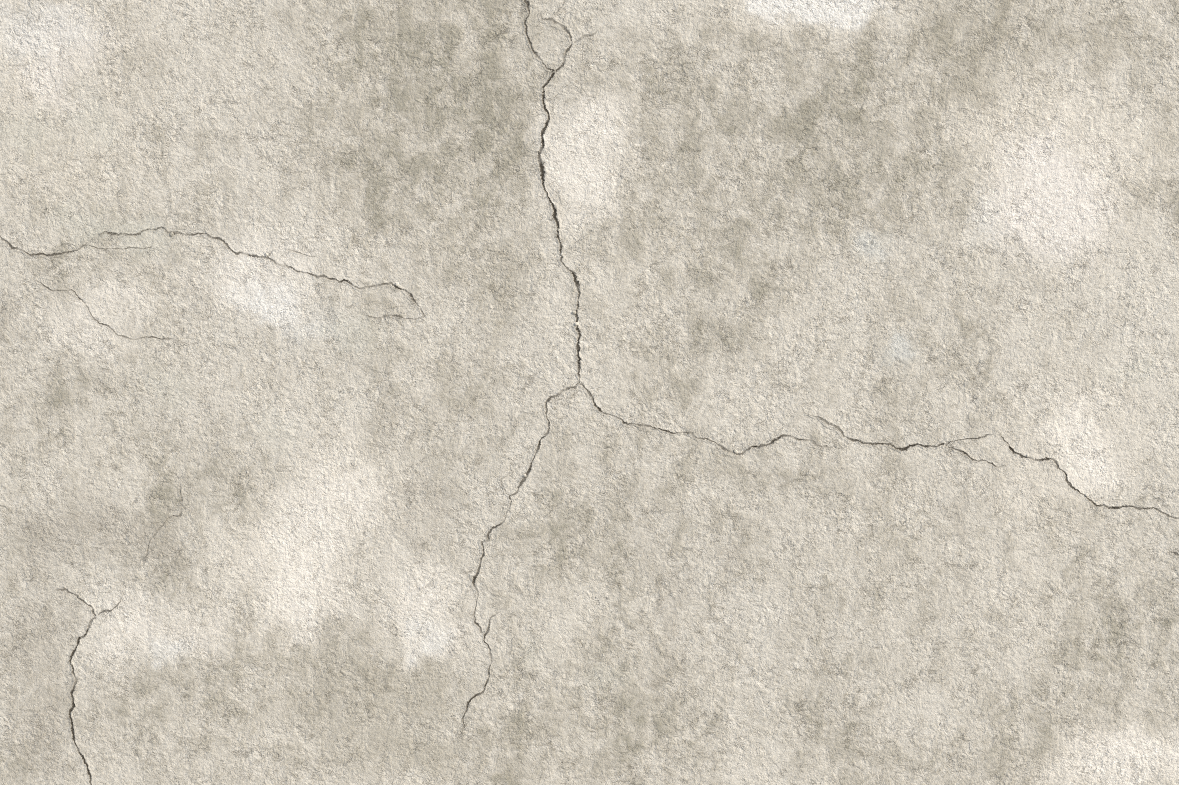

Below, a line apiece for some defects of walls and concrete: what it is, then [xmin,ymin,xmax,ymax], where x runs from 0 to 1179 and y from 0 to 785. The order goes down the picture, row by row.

crack [0,224,428,346]
crack [458,0,1179,731]
crack [53,585,124,785]